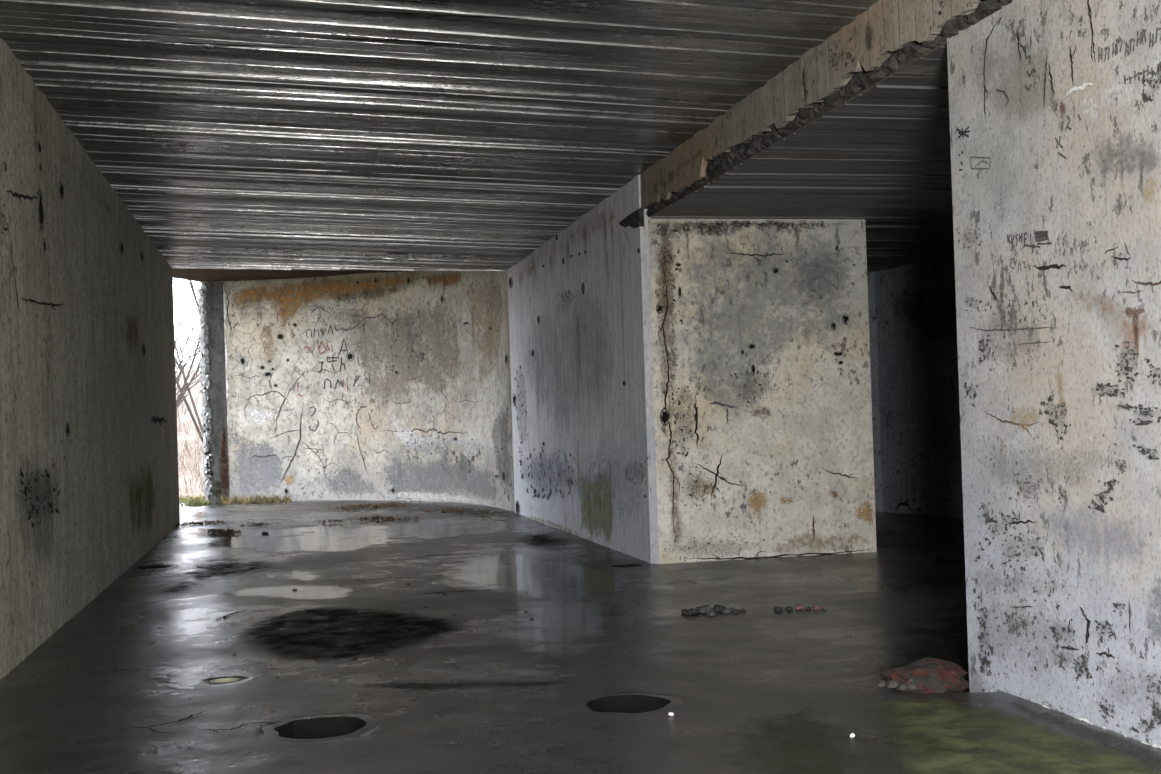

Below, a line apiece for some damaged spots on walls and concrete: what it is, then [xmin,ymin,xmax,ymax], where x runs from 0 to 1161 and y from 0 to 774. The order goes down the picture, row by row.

spalling [613,0,1012,329]
corrosion [233,278,413,317]
corrosion [1126,308,1145,353]
crack [225,289,511,486]
crack [657,234,873,584]
leakage [236,440,282,496]
leakage [329,468,373,495]
leakage [385,417,508,500]
spalling [973,395,1161,748]